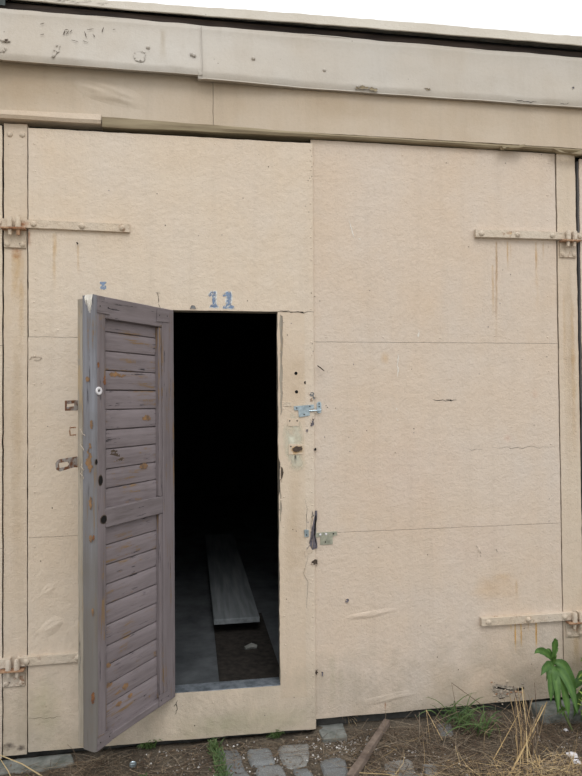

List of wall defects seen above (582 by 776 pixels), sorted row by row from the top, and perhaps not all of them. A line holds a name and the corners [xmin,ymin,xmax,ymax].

spalling [491,680,524,705]